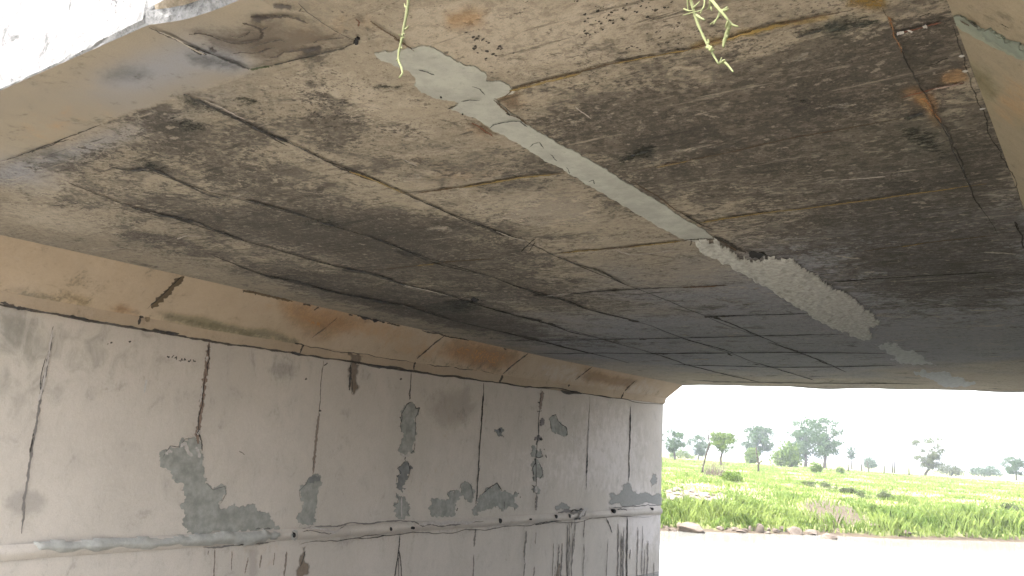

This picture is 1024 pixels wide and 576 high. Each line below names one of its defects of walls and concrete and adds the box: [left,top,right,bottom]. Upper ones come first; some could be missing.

crack [183,10,851,252]
crack [513,10,1022,322]
crack [261,236,492,310]
flaking render [159,437,280,534]
flaking render [296,473,323,526]
flaking render [393,402,420,520]
crack [0,276,908,576]
flaking render [428,481,521,518]
flaking render [530,414,568,494]